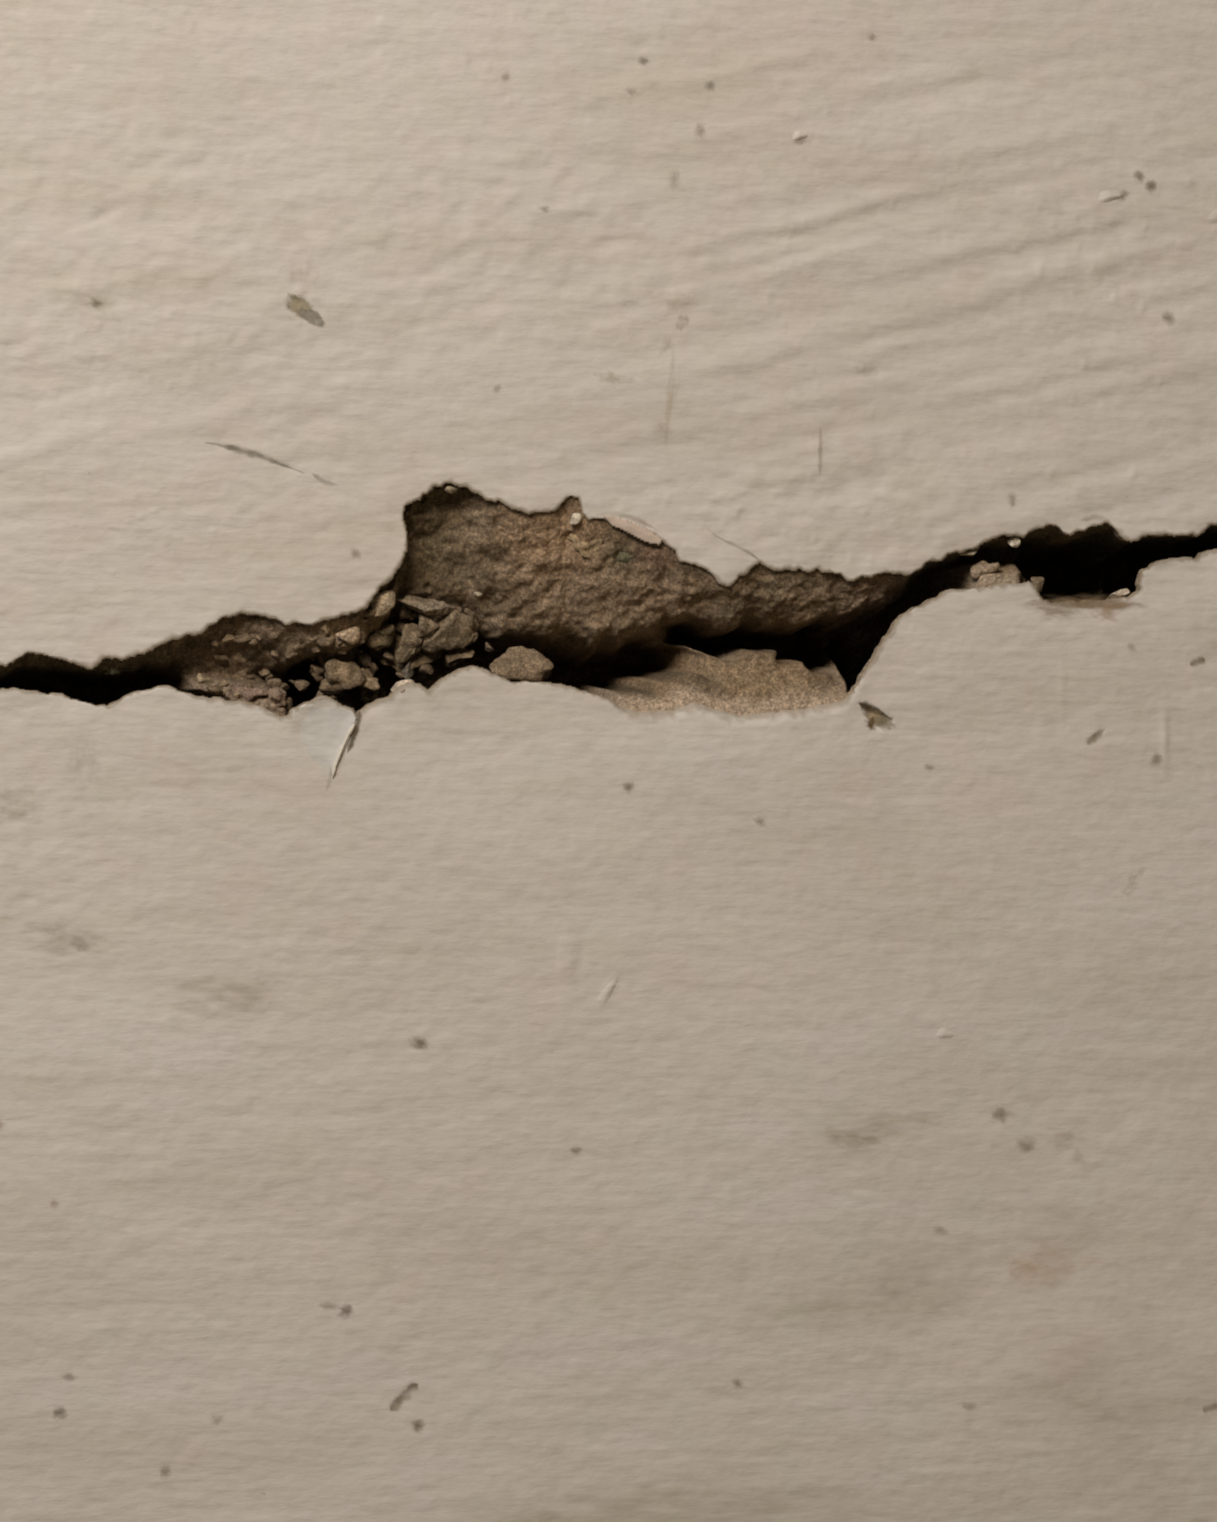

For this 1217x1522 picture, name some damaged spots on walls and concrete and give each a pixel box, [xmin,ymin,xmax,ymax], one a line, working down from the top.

flaking render [284,482,910,729]
crack [876,522,1217,643]
crack [0,612,359,779]